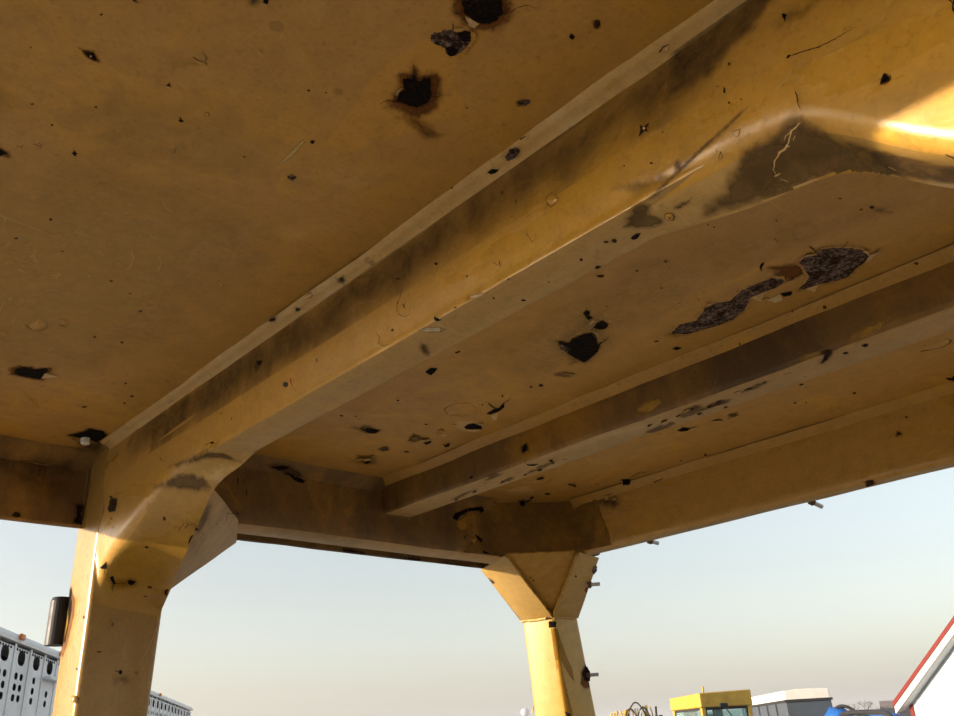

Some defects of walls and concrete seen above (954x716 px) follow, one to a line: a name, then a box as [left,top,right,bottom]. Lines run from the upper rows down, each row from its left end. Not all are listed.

peeling [425,16,479,58]
crack [773,91,801,182]
damp [706,121,954,214]
peeling [669,242,882,335]